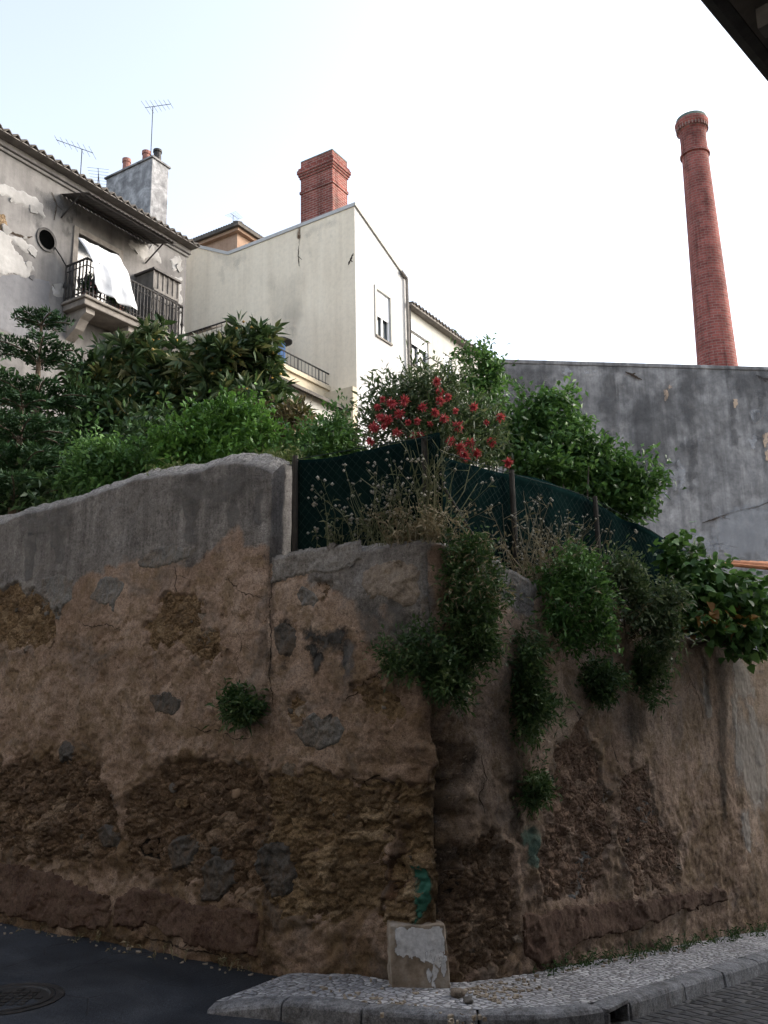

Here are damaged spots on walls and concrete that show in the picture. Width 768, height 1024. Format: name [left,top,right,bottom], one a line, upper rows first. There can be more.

peeling [0,184,45,219]
peeling [0,214,38,281]
peeling [128,240,186,339]
crack [696,502,768,548]
spalling [0,583,60,653]
spalling [145,592,228,665]
spalling [0,716,728,973]